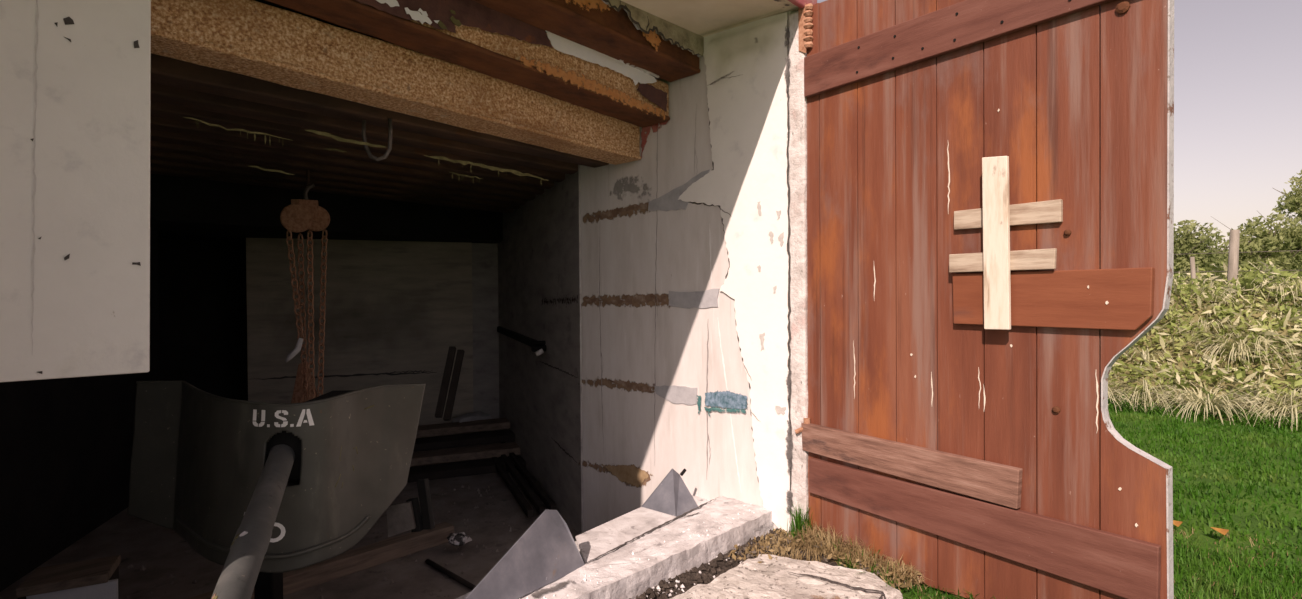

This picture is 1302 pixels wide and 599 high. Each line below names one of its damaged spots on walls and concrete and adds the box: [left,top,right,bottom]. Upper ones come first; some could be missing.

peeling [376,0,462,29]
spalling [602,0,704,57]
peeling [545,30,659,86]
spalling [583,170,710,223]
spalling [542,289,720,309]